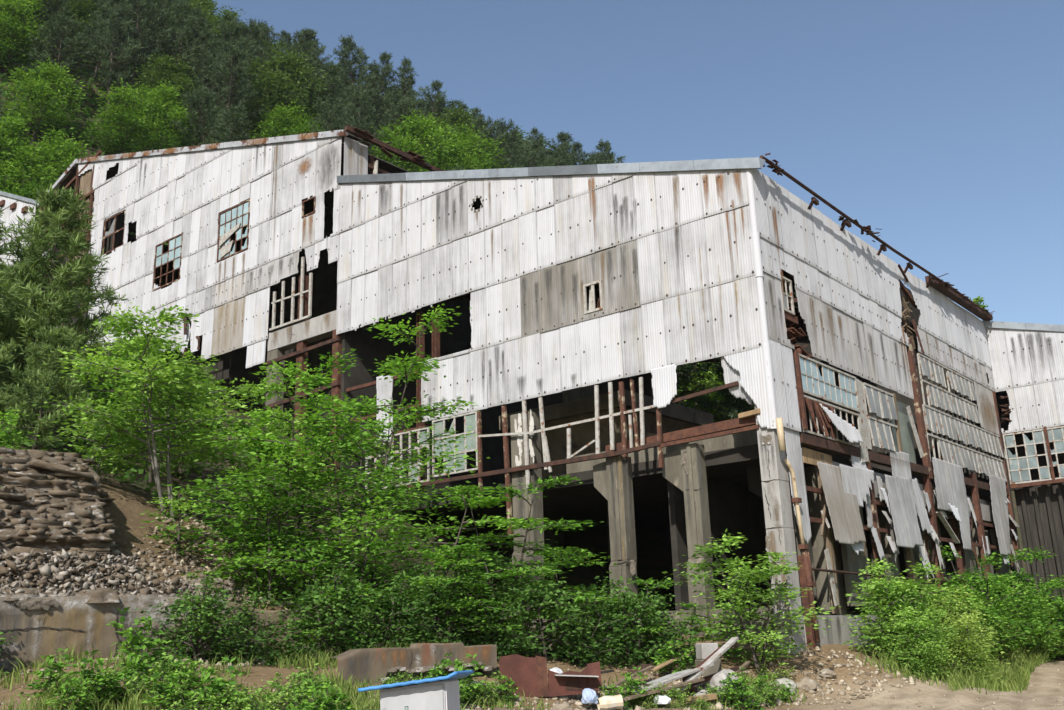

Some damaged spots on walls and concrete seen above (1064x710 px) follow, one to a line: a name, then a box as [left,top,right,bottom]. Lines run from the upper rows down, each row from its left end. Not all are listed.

corrosion [703,173,740,193]
damp [522,267,577,298]